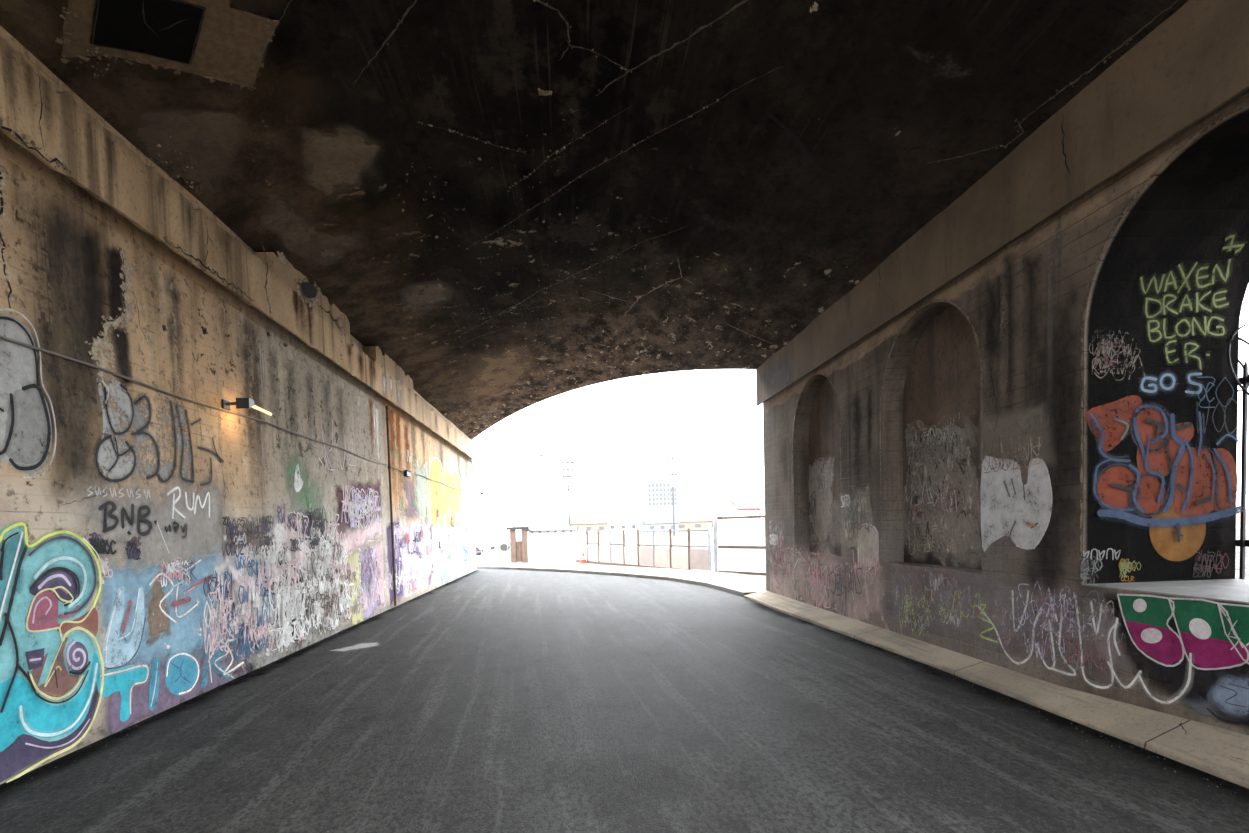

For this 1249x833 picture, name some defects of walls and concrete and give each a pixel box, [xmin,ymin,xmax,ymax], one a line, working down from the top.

crack [0,161,15,308]
water stain [30,206,131,486]
crack [353,0,417,84]
crack [416,0,784,250]